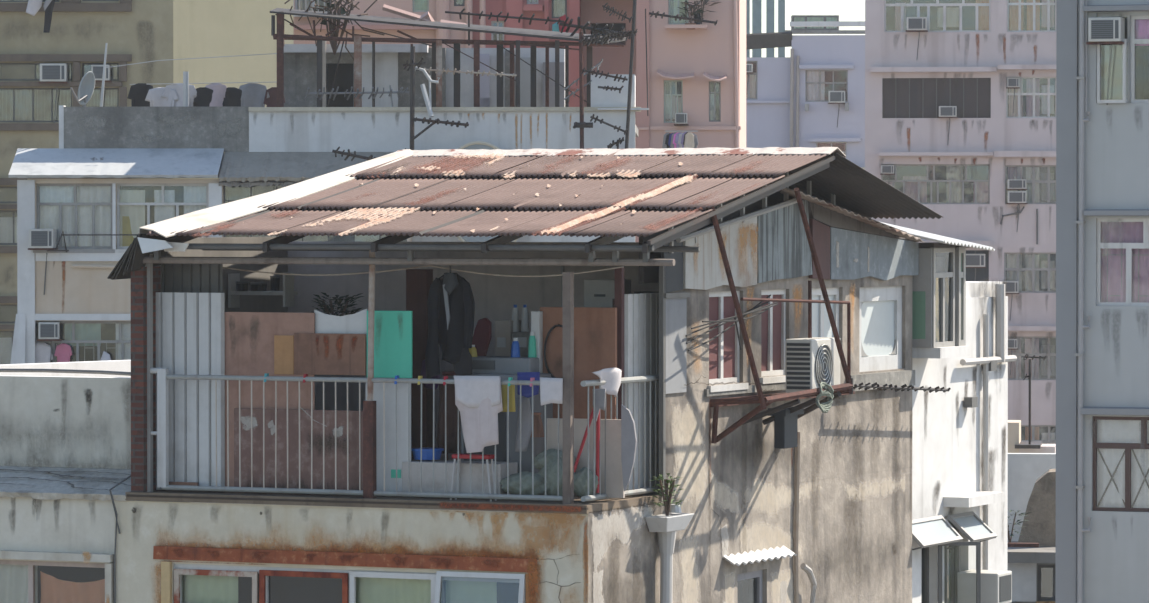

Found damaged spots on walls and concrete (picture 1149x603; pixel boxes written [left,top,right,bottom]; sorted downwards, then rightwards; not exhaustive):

water stain [982,397,1006,491]
corrosion [156,503,588,603]
crack [537,554,581,603]